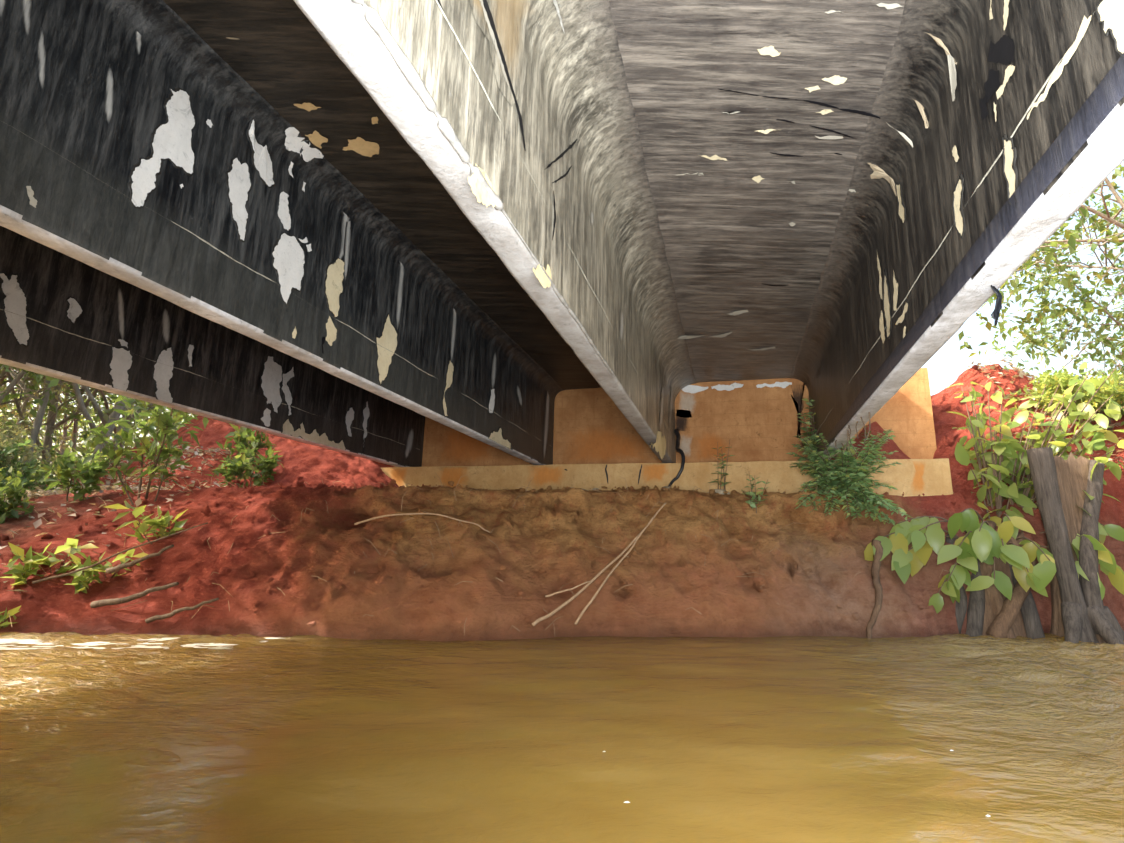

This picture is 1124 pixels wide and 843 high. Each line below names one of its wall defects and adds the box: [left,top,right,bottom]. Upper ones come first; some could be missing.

peeling [924,32,957,101]
peeling [1027,0,1124,120]
peeling [128,87,213,209]
peeling [226,118,312,305]
peeling [285,127,328,192]
crack [479,0,577,240]
peeling [952,146,965,239]
peeling [1002,134,1018,207]
peeling [0,272,30,347]
peeling [322,258,345,353]
peeling [877,254,909,343]
peeling [260,313,398,455]